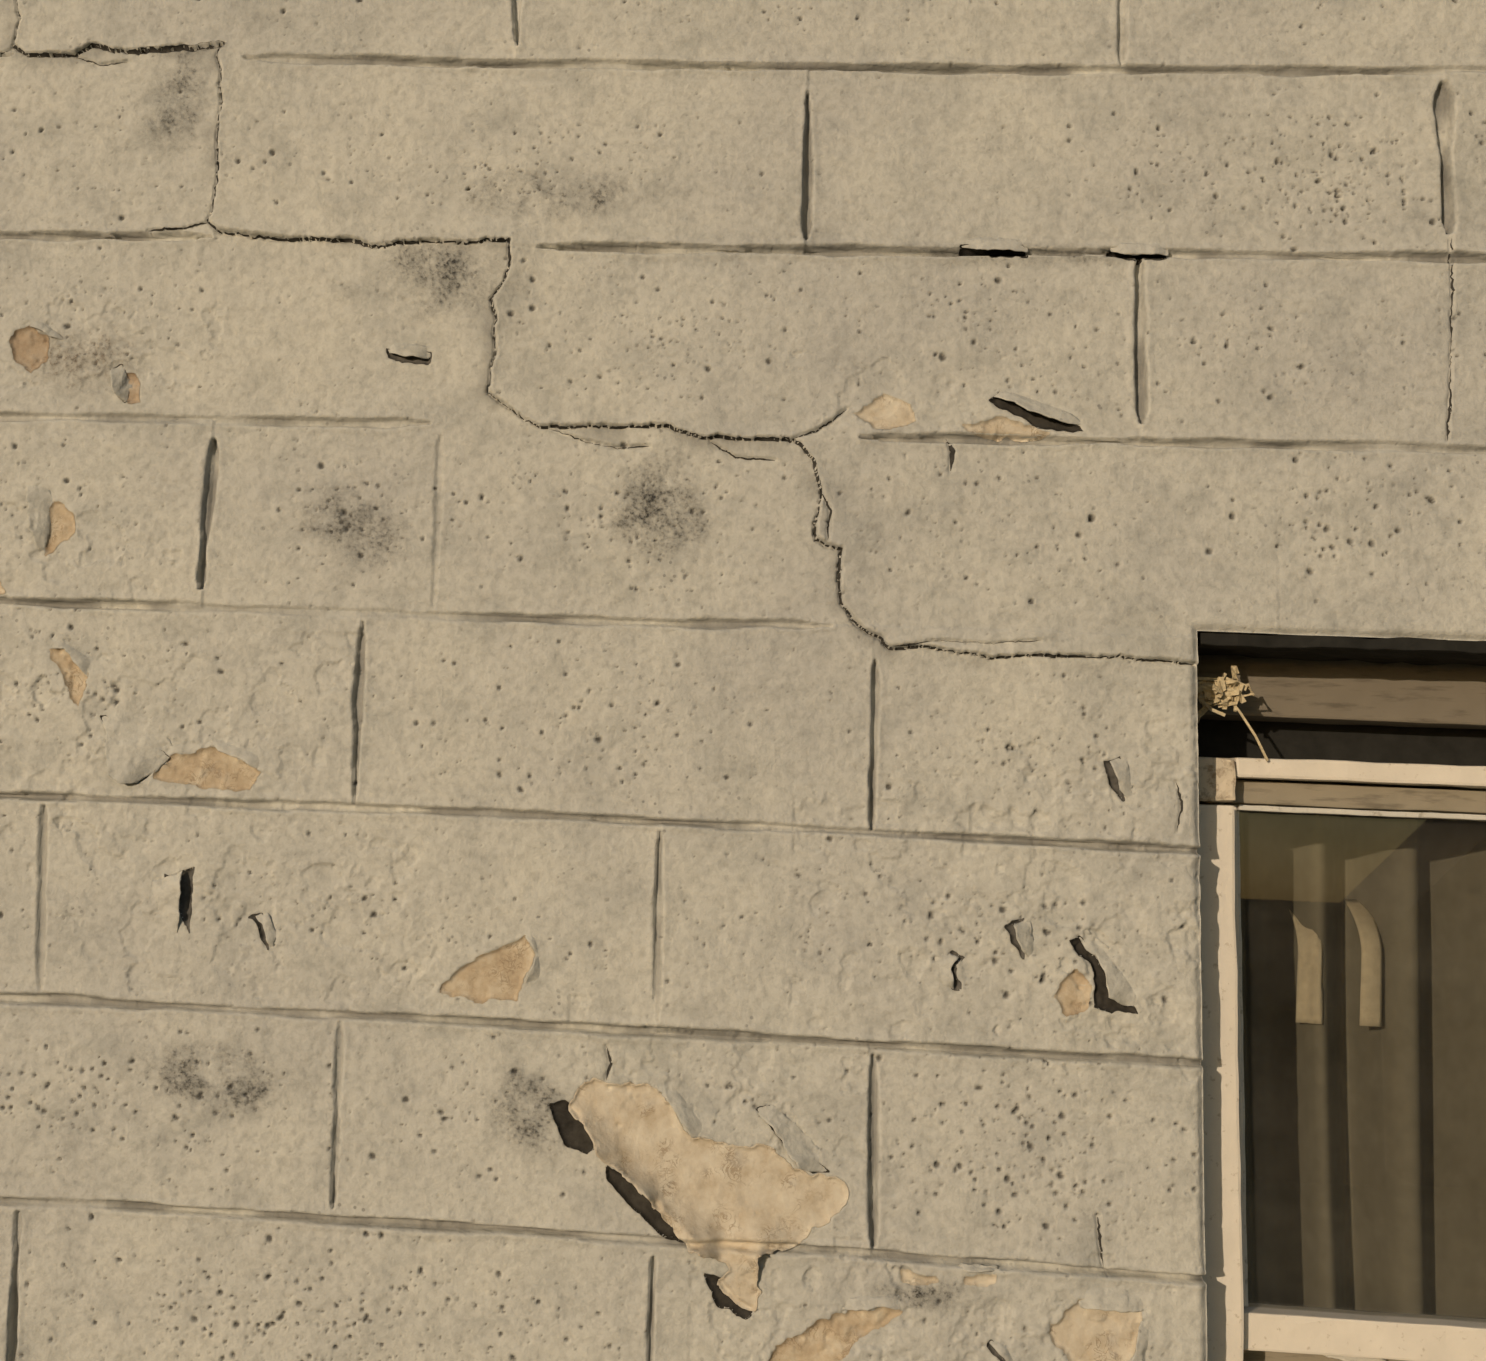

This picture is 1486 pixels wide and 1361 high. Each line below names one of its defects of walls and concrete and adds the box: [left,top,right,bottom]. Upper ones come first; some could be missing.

peeling [9,321,63,373]
peeling [110,364,140,404]
crack [1,4,1193,665]
peeling [962,390,1083,442]
peeling [26,484,75,556]
peeling [50,635,90,706]
peeling [100,713,261,792]
peeling [439,935,540,1004]
peeling [1054,930,1138,1017]
peeling [549,1077,849,1320]
peeling [769,1269,939,1361]
peeling [1049,1287,1148,1361]